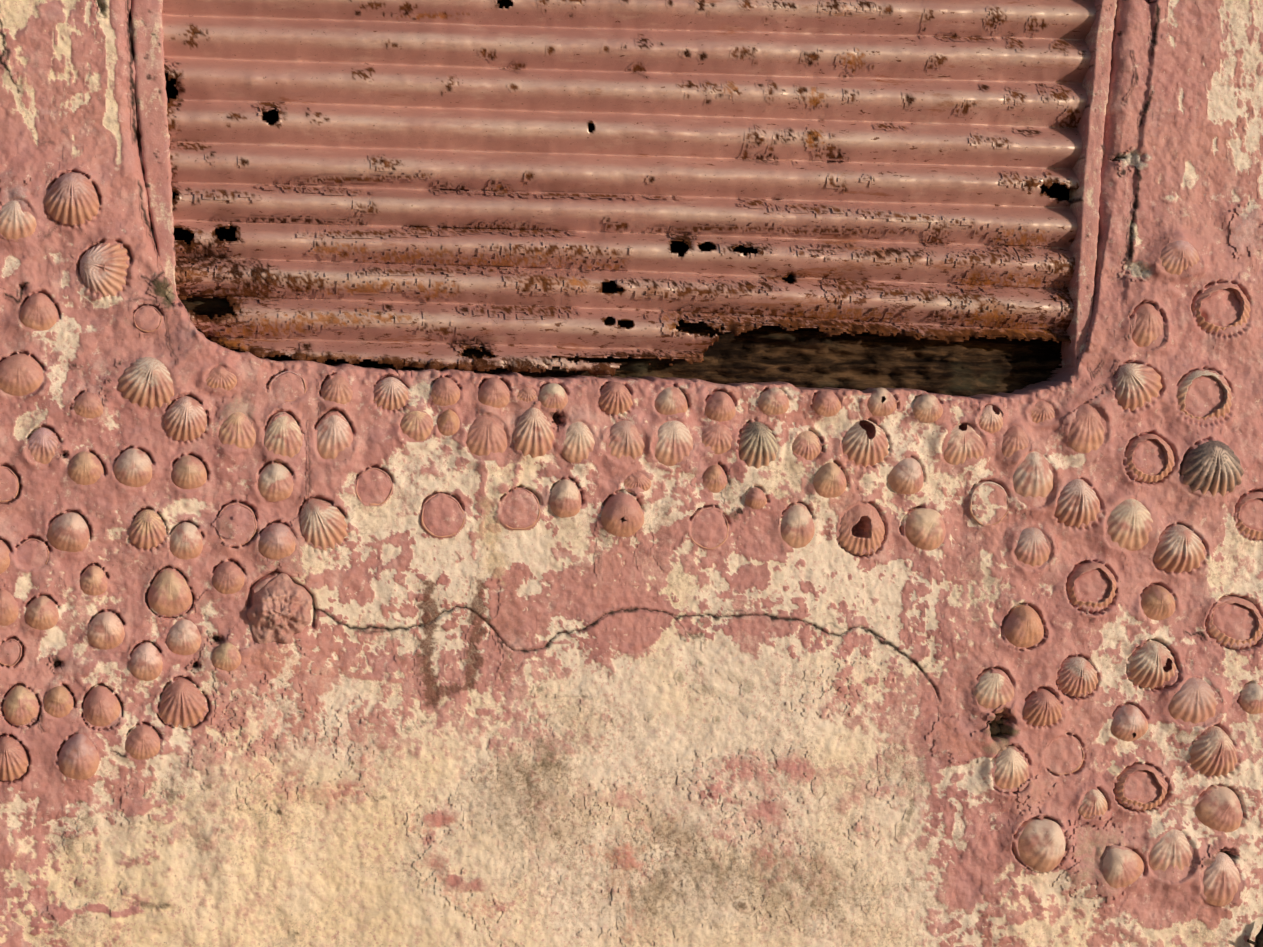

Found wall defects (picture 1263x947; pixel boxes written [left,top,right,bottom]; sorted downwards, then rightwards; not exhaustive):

crack [0,2,55,147]
peeling [0,0,146,266]
rust [347,0,484,22]
rust [164,22,1084,373]
rust [736,0,801,24]
rust [818,0,894,17]
rust [919,4,1088,72]
crack [1126,167,1144,261]
crack [1113,0,1161,129]
peeling [1105,0,1263,306]
crack [306,572,947,718]
peeling [0,216,1263,947]